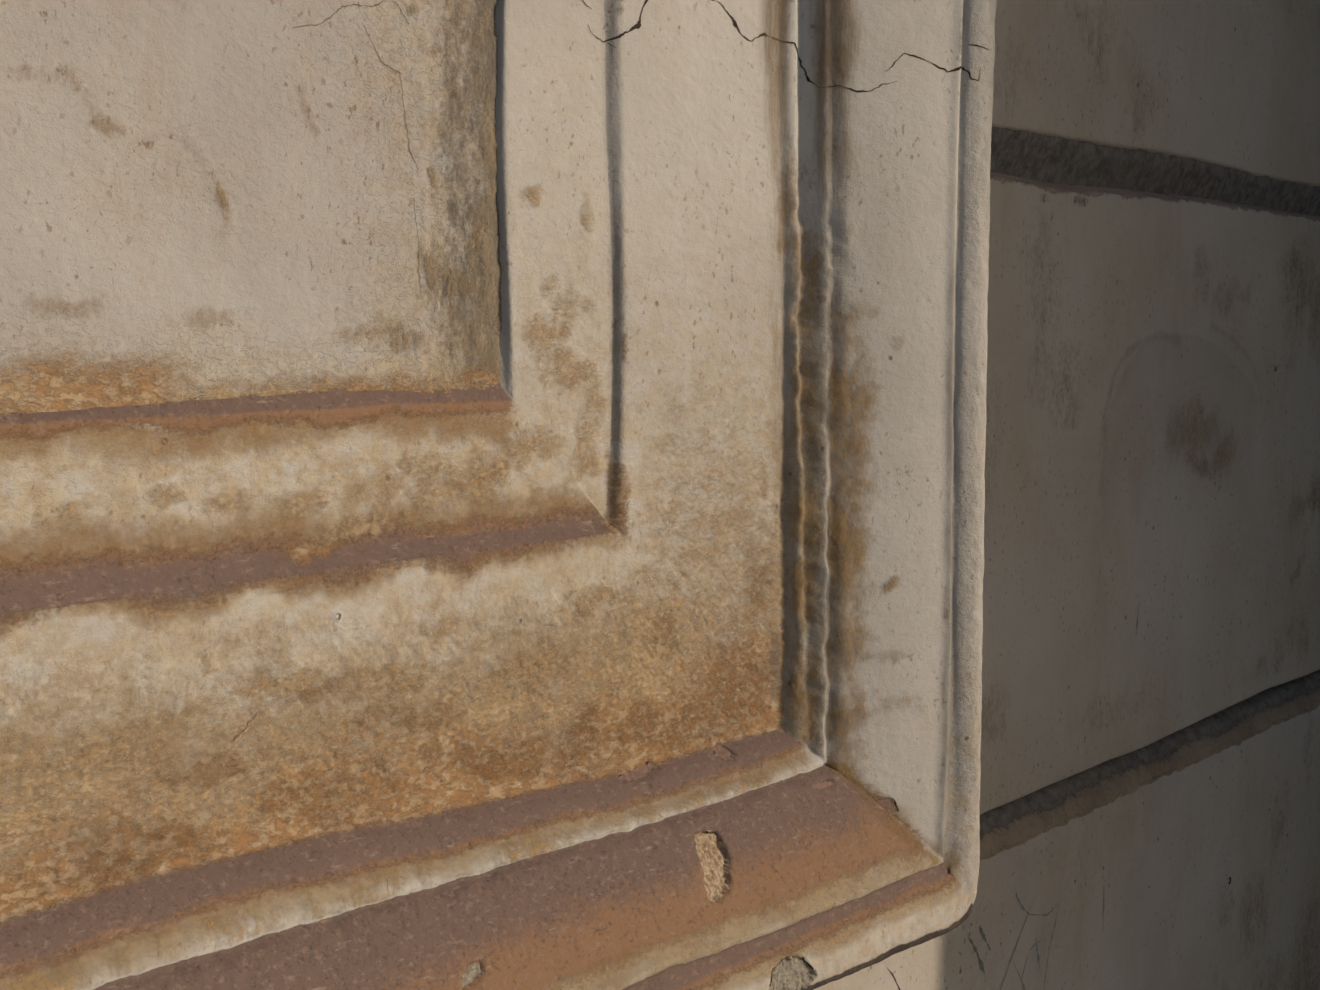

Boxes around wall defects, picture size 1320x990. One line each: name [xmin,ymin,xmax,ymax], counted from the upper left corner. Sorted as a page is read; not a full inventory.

crack [293,1,417,166]
crack [582,0,648,48]
leakage [766,0,787,132]
leakage [817,0,851,108]
crack [712,0,989,93]
leakage [0,416,327,457]
leakage [0,464,630,595]
leakage [826,362,879,802]
leakage [0,749,805,990]
spalling [694,830,730,902]
spalling [461,960,484,988]
spalling [769,955,818,990]